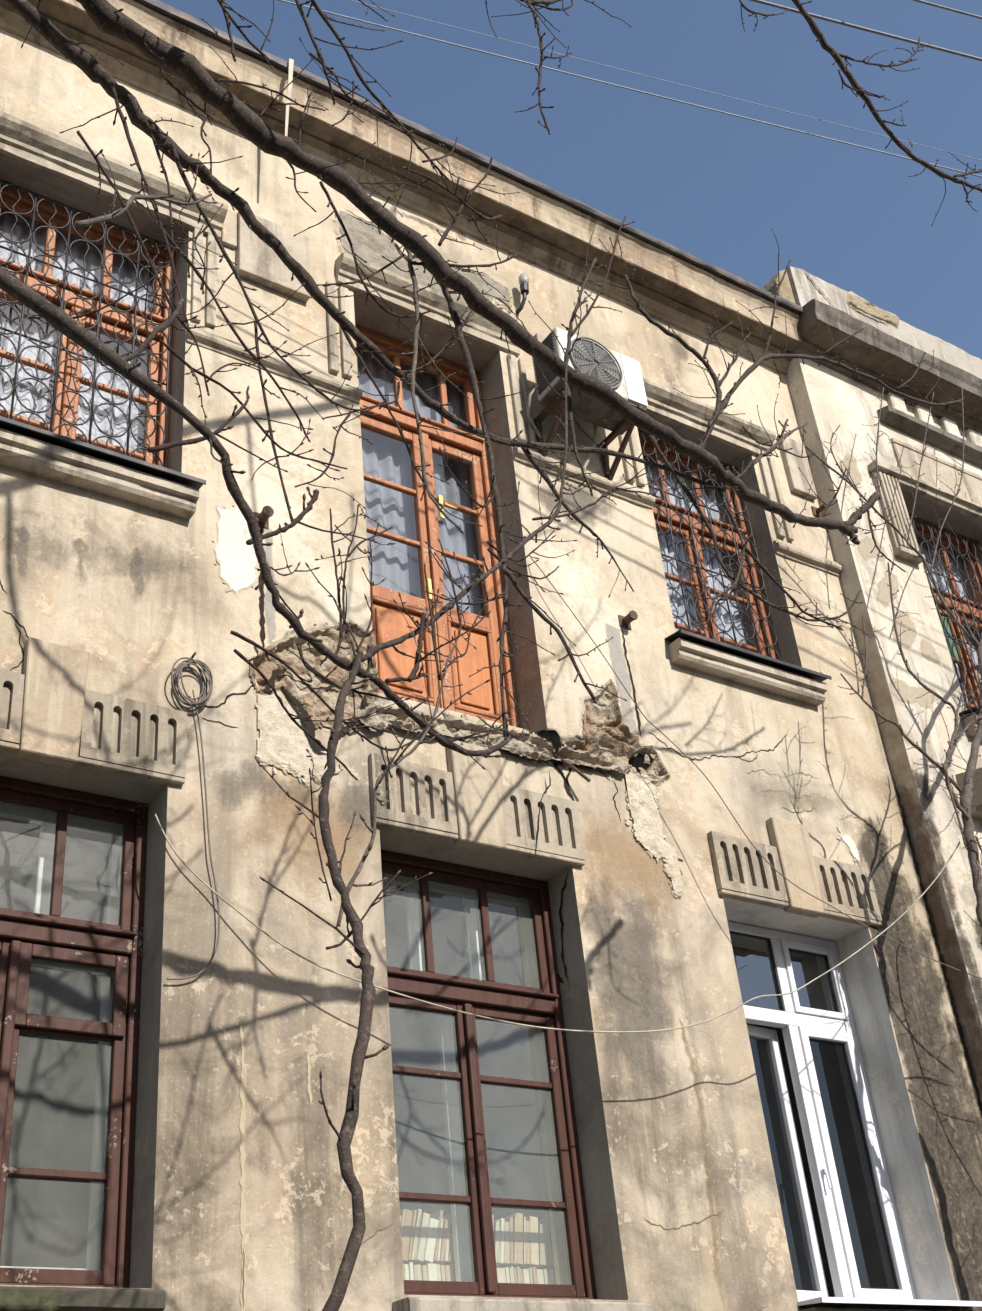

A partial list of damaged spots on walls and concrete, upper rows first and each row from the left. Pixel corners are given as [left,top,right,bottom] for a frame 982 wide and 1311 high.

spalling [331,209,466,303]
spalling [447,262,527,330]
spalling [212,504,381,787]
spalling [560,624,671,787]
crack [622,629,826,813]
leakage [913,772,982,1023]
crack [239,1023,247,1311]
leakage [858,819,982,1311]